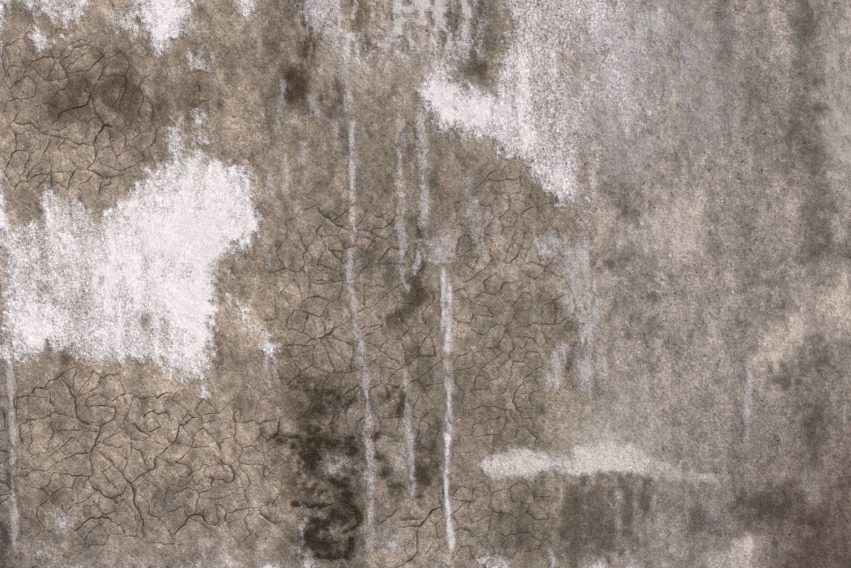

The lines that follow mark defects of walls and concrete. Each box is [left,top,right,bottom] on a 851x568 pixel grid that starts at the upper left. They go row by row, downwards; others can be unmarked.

crack [2,31,158,191]
water stain [388,187,429,326]
crack [273,172,569,473]
water stain [441,270,452,352]
crack [0,367,547,567]
water stain [277,425,364,568]
water stain [414,385,454,549]